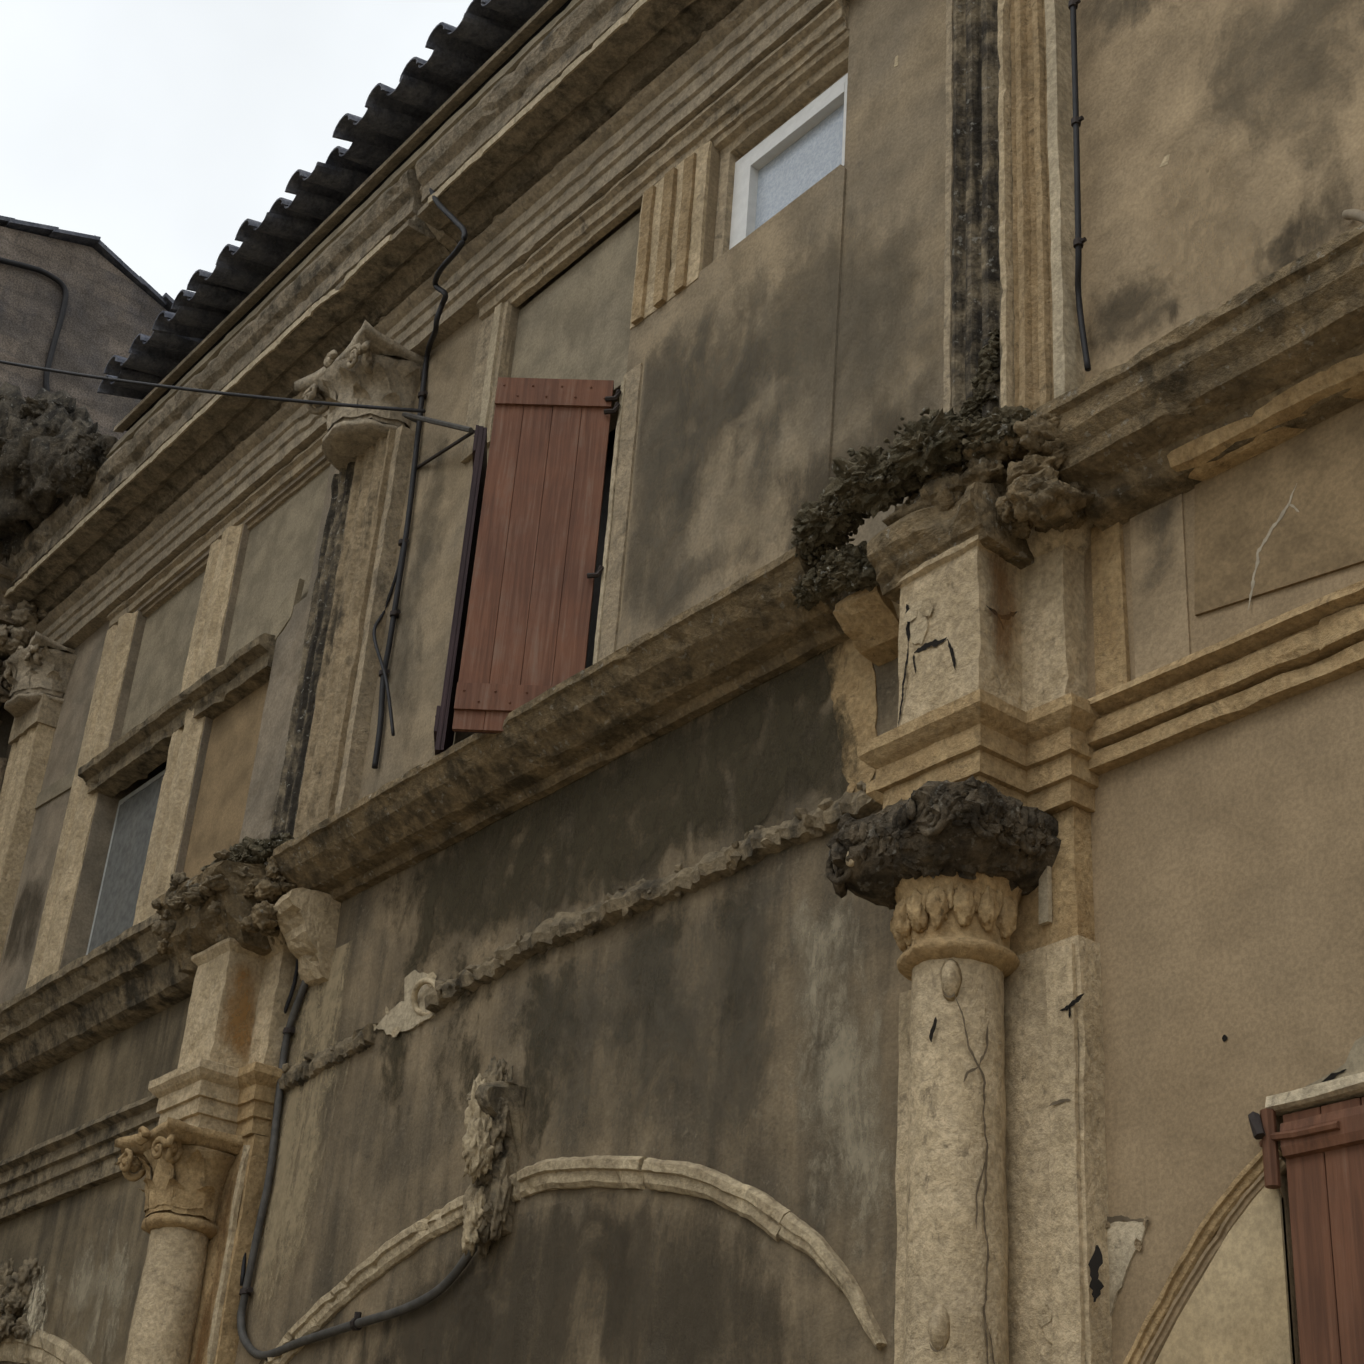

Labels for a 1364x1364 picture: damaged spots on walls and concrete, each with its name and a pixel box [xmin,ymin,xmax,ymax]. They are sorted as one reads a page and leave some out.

water stain [1161,148,1244,287]
water stain [1092,286,1176,345]
water stain [623,319,752,619]
crack [1248,483,1299,609]
crack [898,604,956,725]
water stain [393,646,856,976]
water stain [255,942,350,1301]
water stain [381,1030,411,1099]
water stain [515,953,580,1140]
water stain [796,903,888,1219]
crack [929,995,995,1364]
water stain [379,1208,780,1364]